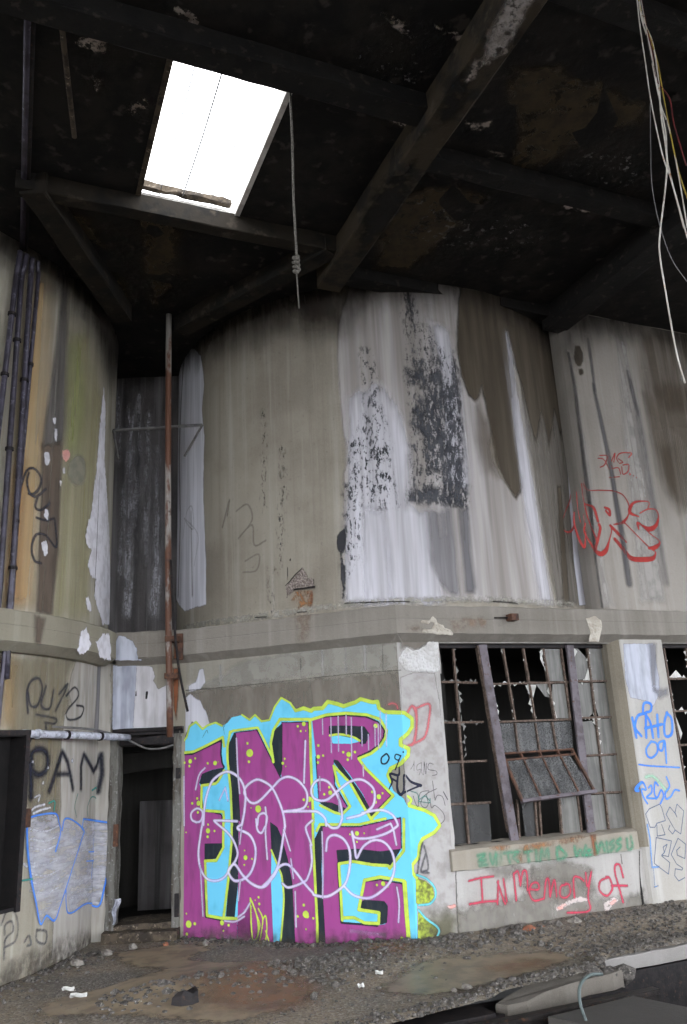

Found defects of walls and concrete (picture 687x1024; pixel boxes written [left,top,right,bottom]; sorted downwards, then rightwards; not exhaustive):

peeling [439,0,532,122]
water stain [506,65,647,169]
water stain [376,187,542,270]
water stain [36,292,160,643]
water stain [186,287,586,629]
peeling [586,616,602,642]
peeling [52,628,167,961]
peeling [398,616,458,937]
peeling [556,897,588,911]